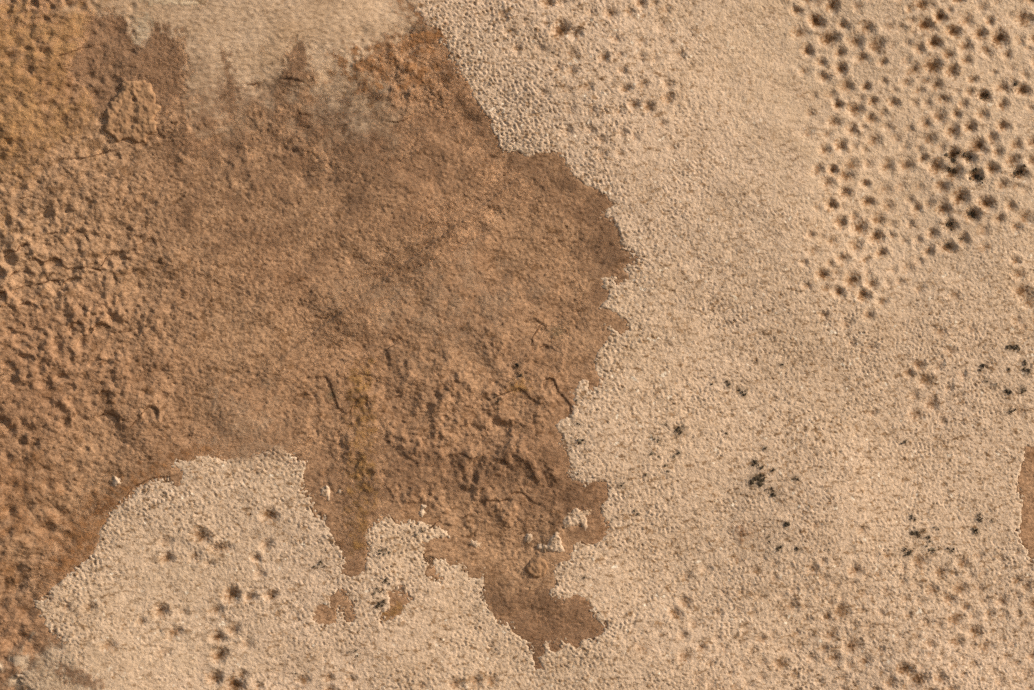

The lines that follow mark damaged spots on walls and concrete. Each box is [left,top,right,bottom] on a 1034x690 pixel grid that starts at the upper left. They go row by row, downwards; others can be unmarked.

water stain [283,42,308,86]
water stain [167,53,440,223]
water stain [945,152,984,183]